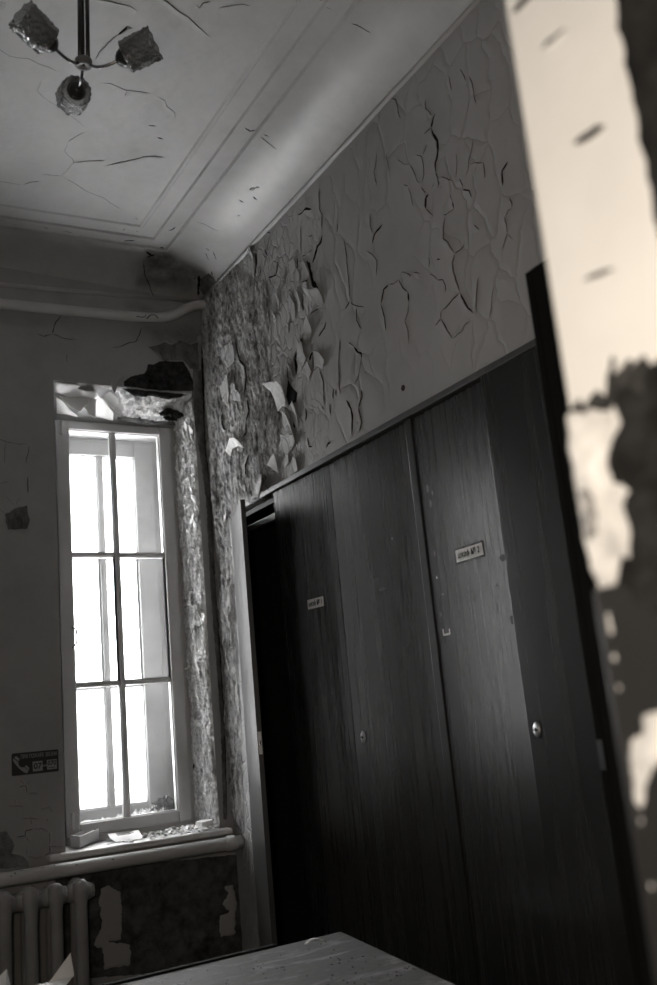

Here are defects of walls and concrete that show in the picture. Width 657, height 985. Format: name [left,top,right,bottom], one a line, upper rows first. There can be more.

crack [66,0,251,167]
crack [243,128,277,150]
spalling [573,125,606,154]
flaking render [616,0,657,225]
crack [253,70,513,451]
crack [471,345,522,374]
peeling [5,505,34,534]
spalling [55,247,325,833]
flaking render [566,354,657,613]
flaking render [629,712,657,825]
peeling [0,830,55,877]
flaking render [55,855,243,978]